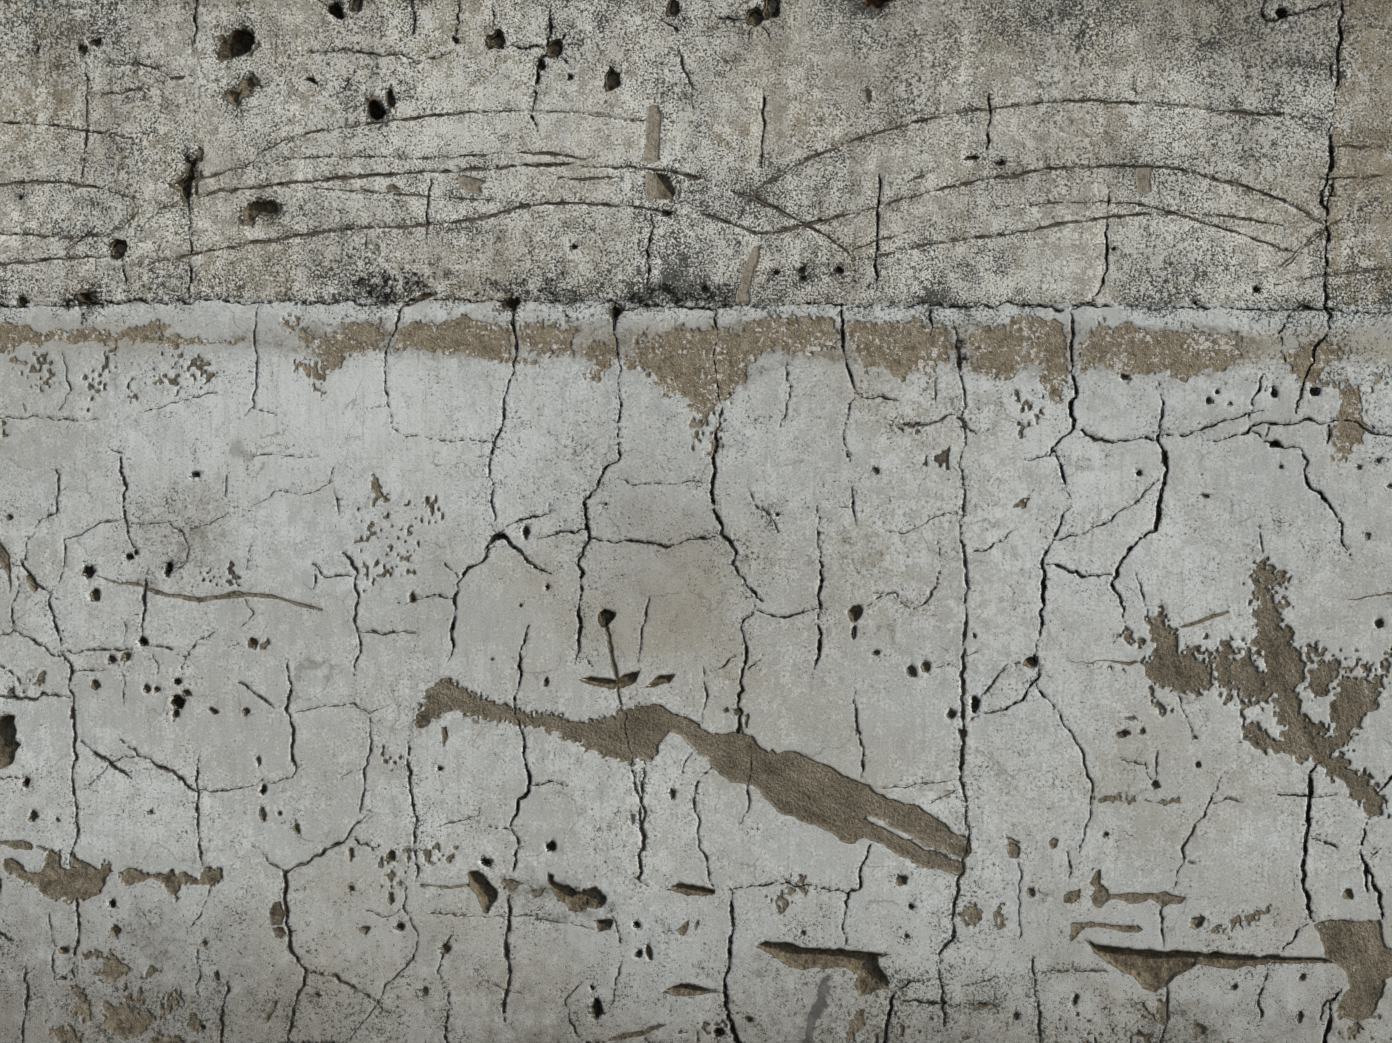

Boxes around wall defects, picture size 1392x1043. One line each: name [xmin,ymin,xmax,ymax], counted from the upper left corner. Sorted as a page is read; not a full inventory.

crack [81,64,89,185]
crack [425,178,433,239]
crack [0,190,551,660]
flaking render [277,245,1244,457]
crack [540,0,1392,1043]
crack [0,449,623,1043]
flaking render [413,605,972,886]
flaking render [1069,557,1392,819]
flaking render [0,840,223,905]
spalling [420,871,614,932]
spalling [755,941,939,1043]
flaking render [1058,869,1392,1043]